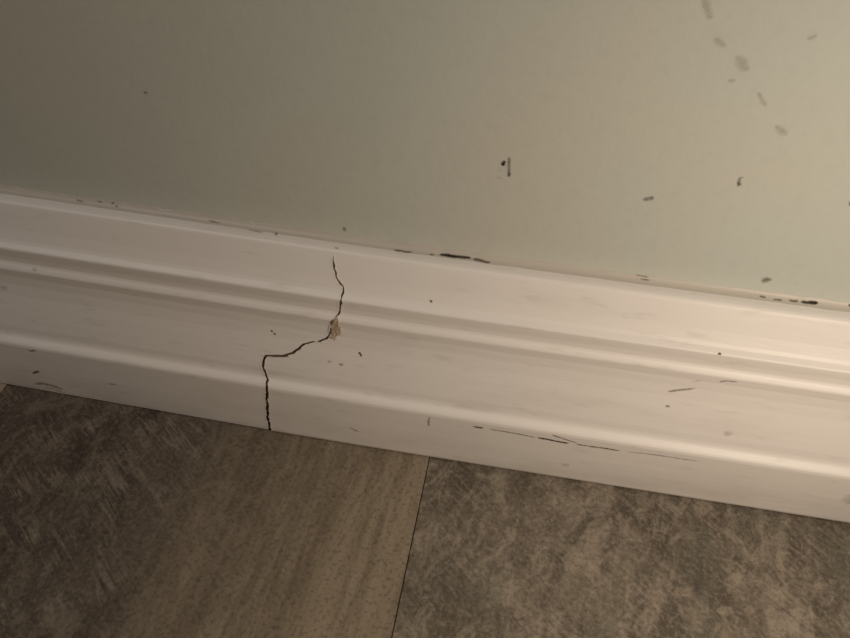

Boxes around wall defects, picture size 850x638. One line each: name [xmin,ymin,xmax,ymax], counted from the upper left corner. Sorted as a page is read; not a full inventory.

crack [262,255,344,429]